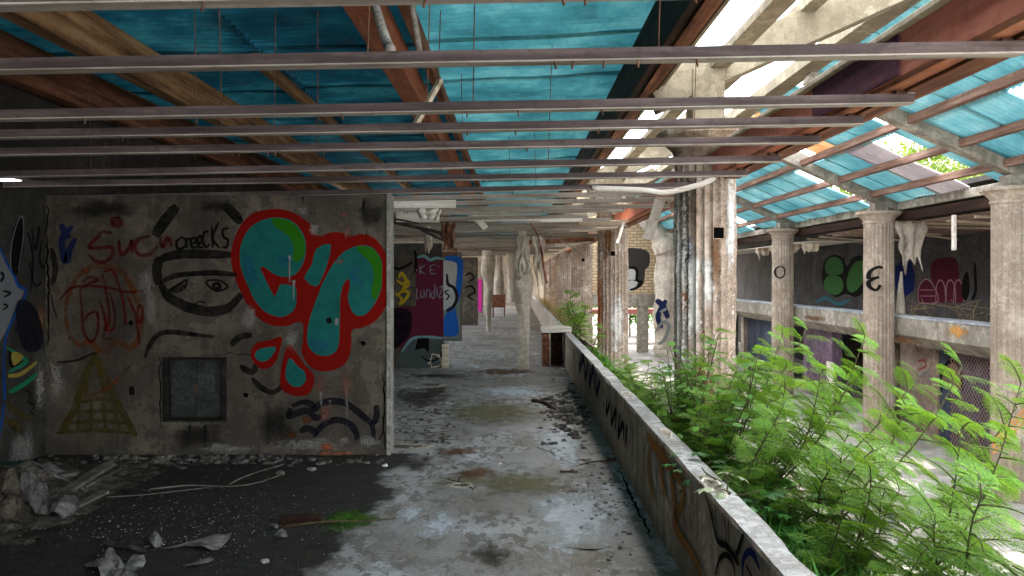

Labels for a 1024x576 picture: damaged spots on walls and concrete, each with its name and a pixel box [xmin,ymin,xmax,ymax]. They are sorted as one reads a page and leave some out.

damp [395,373,463,407]
damp [451,403,530,423]
damp [460,474,564,494]
crack [619,470,652,539]